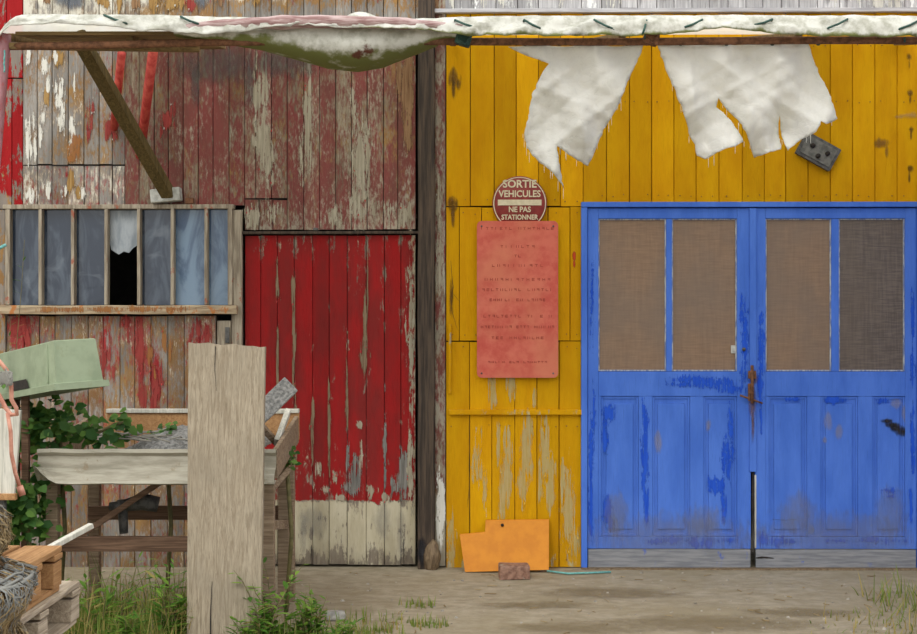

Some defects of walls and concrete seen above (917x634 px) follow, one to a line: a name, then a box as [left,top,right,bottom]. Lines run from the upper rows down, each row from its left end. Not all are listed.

peeling [95,0,196,15]
peeling [25,50,95,204]
peeling [242,51,284,231]
peeling [298,63,313,202]
peeling [396,57,414,153]
peeling [121,314,173,409]
peeling [275,258,297,409]
peeling [309,88,417,516]
peeling [471,428,487,505]
peeling [488,378,518,409]
peeling [496,380,615,559]
peeling [665,293,765,522]